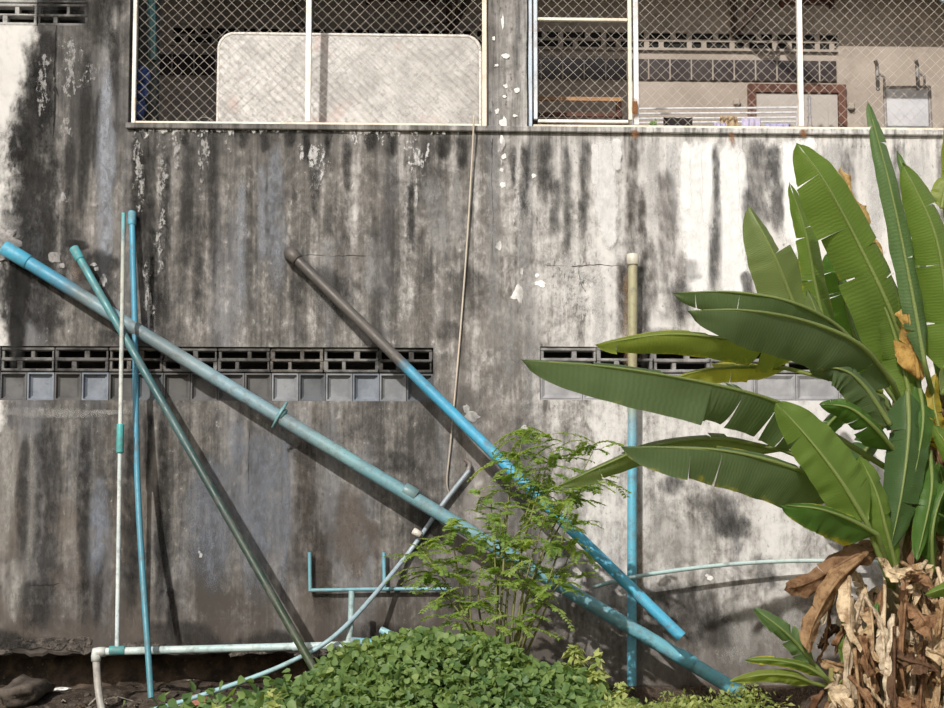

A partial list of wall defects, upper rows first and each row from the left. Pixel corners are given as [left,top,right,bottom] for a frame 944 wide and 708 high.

water stain [0,260,60,369]
water stain [1,0,120,289]
peeling [36,33,100,125]
water stain [130,138,170,320]
water stain [181,131,216,308]
water stain [343,142,351,188]
water stain [511,138,816,334]
water stain [1,408,71,626]
water stain [77,431,104,618]
water stain [123,414,218,645]
water stain [230,426,328,602]
water stain [238,631,293,652]